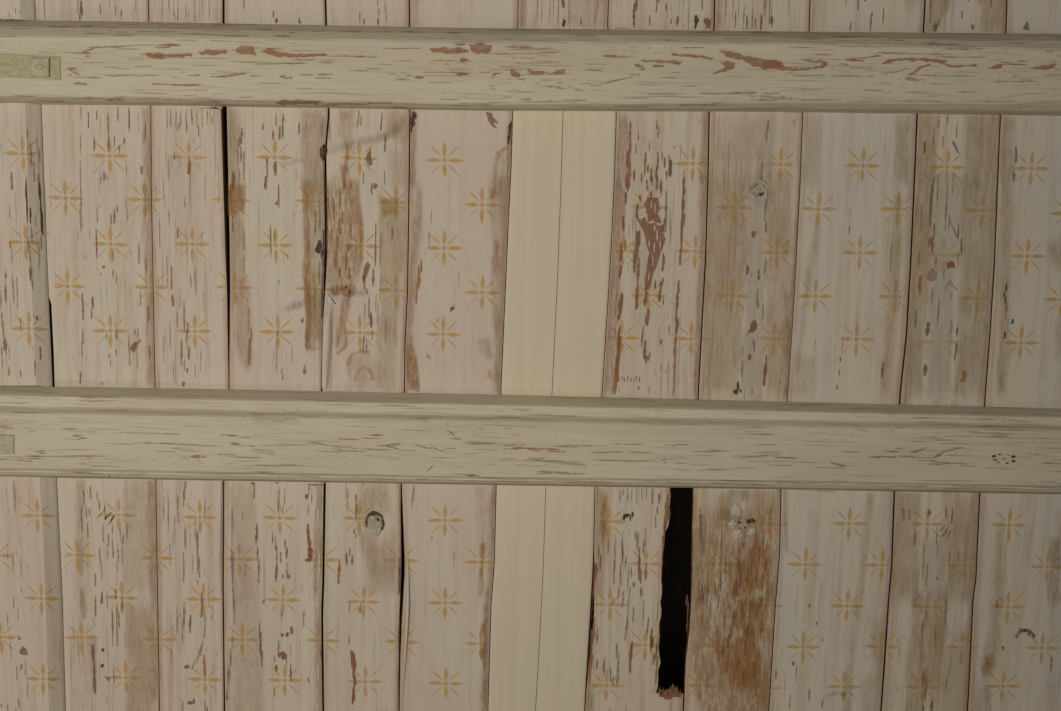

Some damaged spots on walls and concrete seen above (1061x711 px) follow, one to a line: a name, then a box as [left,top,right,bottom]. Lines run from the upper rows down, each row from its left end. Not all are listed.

peeling [588,47,827,83]
peeling [845,45,1056,85]
peeling [606,120,685,395]
leakage [693,513,774,711]